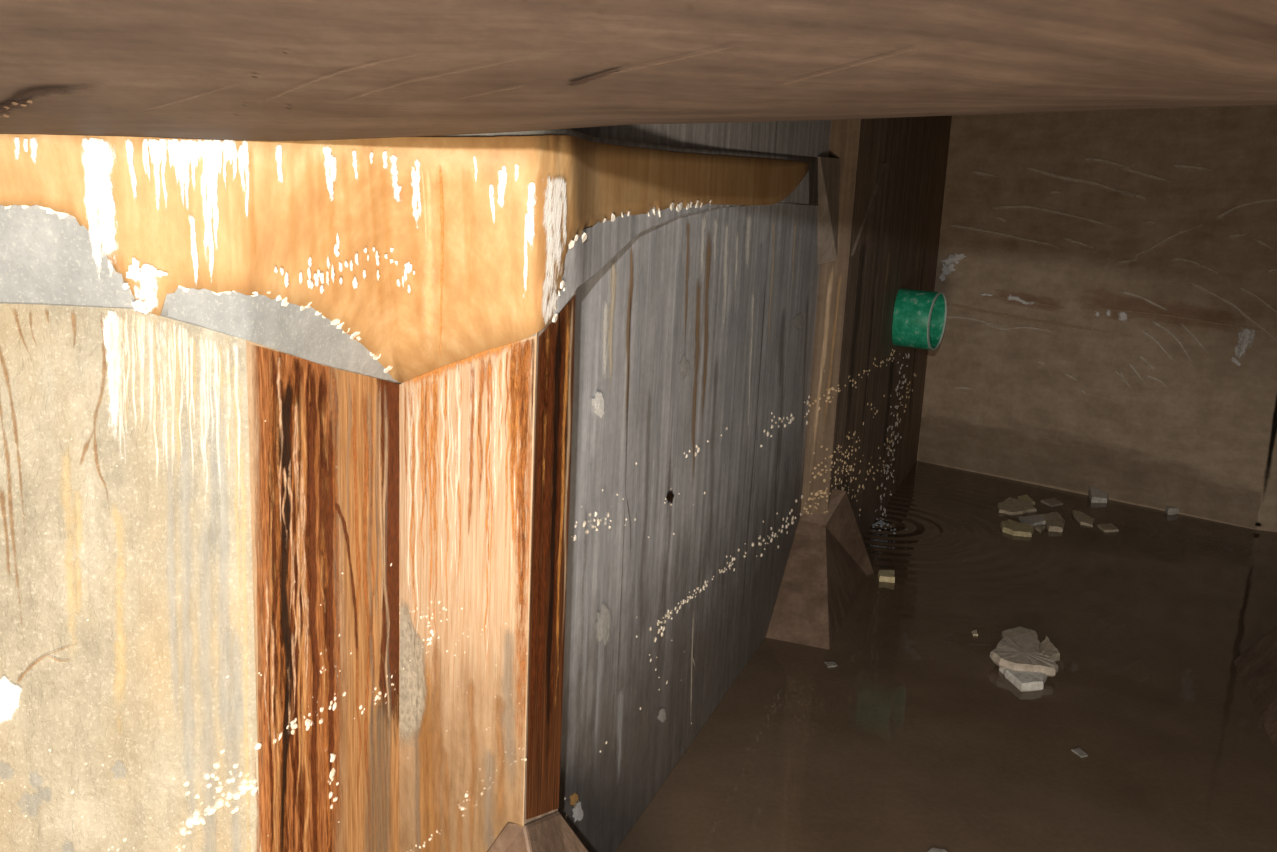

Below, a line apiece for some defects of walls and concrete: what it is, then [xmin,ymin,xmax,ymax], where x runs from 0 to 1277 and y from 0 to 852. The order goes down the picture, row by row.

peeling [0,205,135,308]
leakage [274,147,444,343]
peeling [167,285,402,384]
crack [1265,398,1277,485]
rust [256,296,575,852]
leakage [558,214,917,852]
spalling [0,676,21,722]
crack [18,647,67,682]
leakage [255,691,346,750]
leakage [354,600,486,719]
leakage [172,749,259,852]
leakage [328,753,339,823]